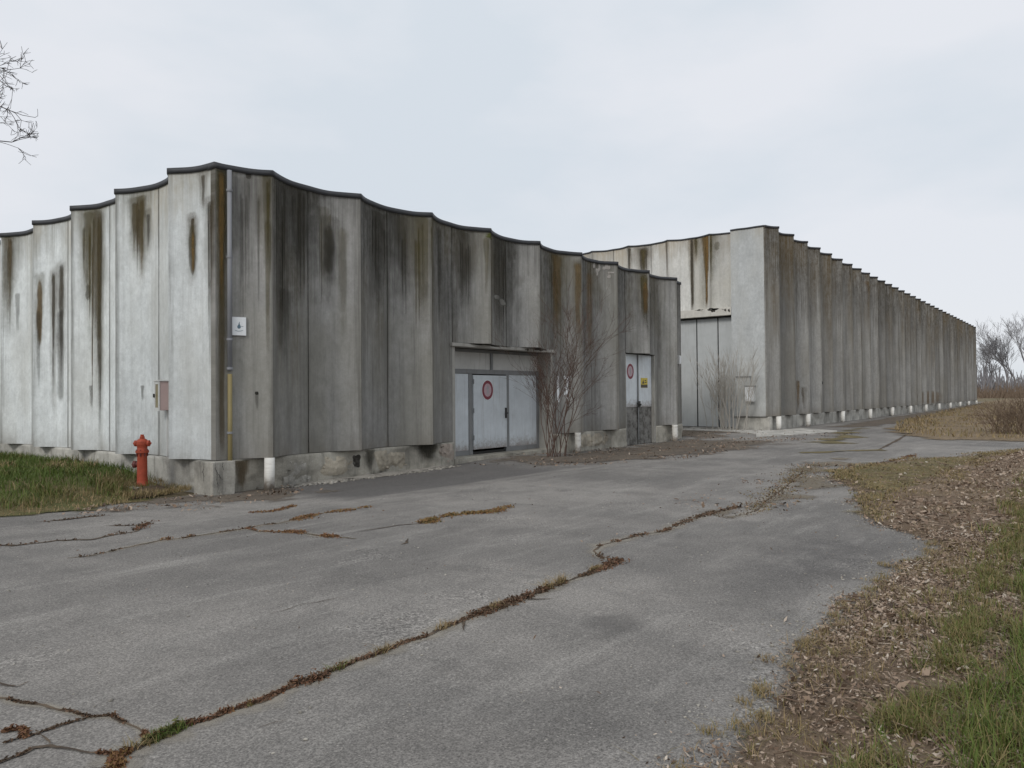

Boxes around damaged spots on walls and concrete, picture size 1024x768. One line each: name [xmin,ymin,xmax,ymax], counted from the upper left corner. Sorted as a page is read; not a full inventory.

water stain [37,266,63,345]
water stain [83,211,102,391]
water stain [132,201,144,242]
water stain [325,227,334,271]
corrosion [702,236,712,303]